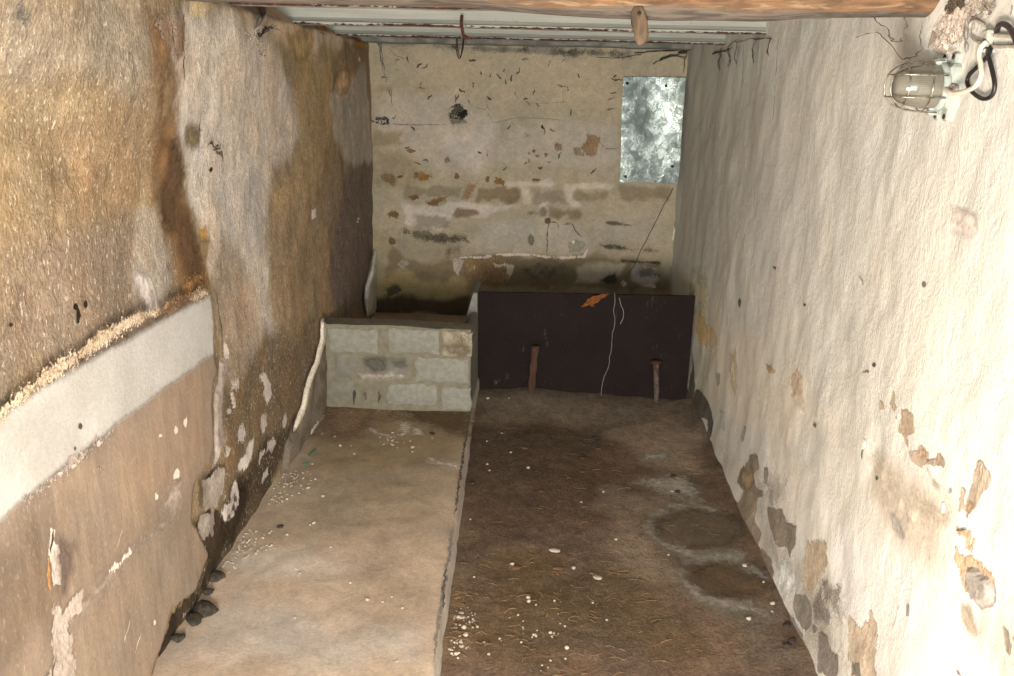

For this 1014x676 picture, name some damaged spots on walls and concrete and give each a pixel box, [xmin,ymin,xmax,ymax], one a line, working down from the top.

flaking render [928,0,998,60]
leakage [149,12,209,299]
peeling [574,134,618,157]
peeling [393,227,588,284]
peeling [690,275,717,348]
flaking render [198,355,229,541]
peeling [879,391,945,468]
peeling [688,358,878,676]
peeling [958,460,991,518]
spalling [1003,627,1014,655]